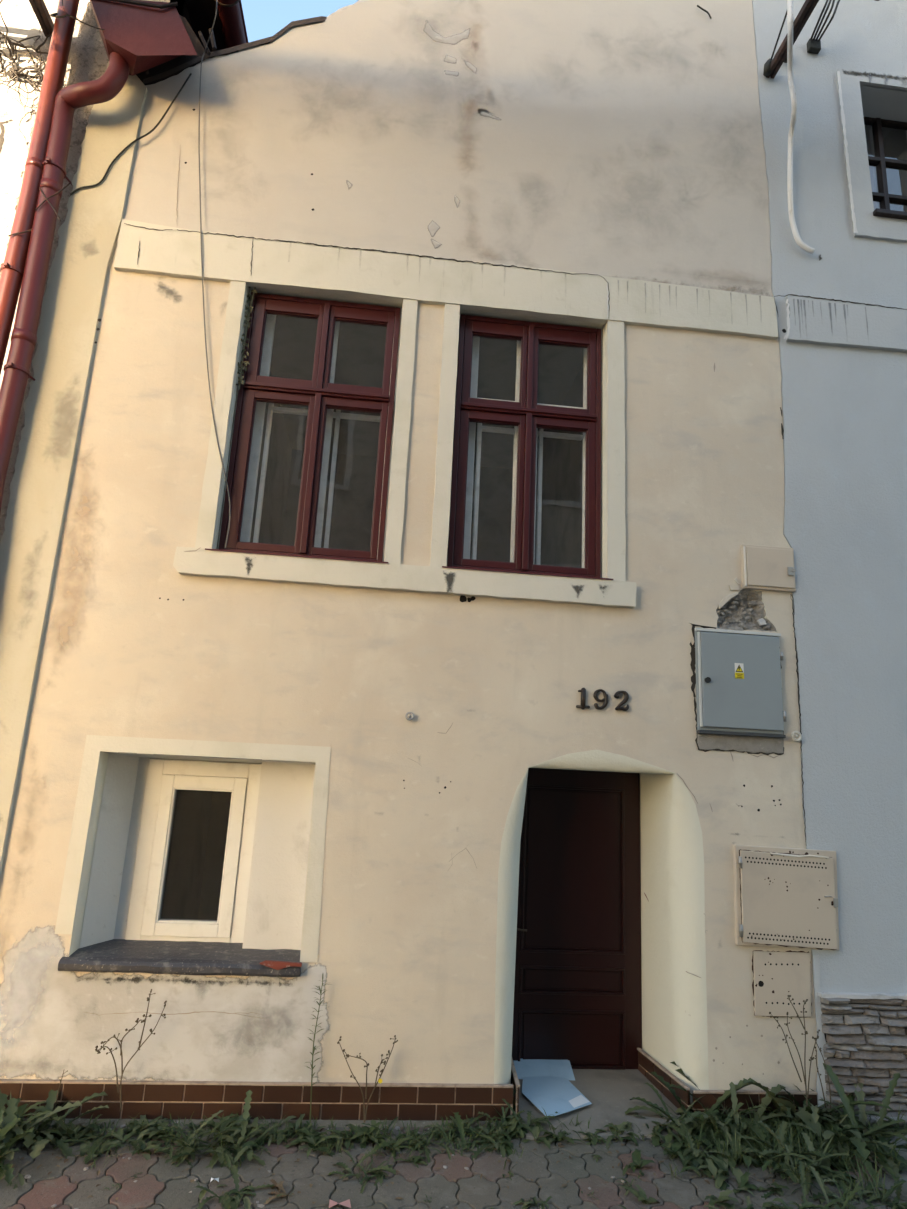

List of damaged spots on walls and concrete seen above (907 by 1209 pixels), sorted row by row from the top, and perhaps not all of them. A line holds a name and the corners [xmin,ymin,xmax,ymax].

crack [0,119,13,152]
flaking render [0,2,42,265]
flaking render [690,578,776,730]
peeling [0,926,329,1082]